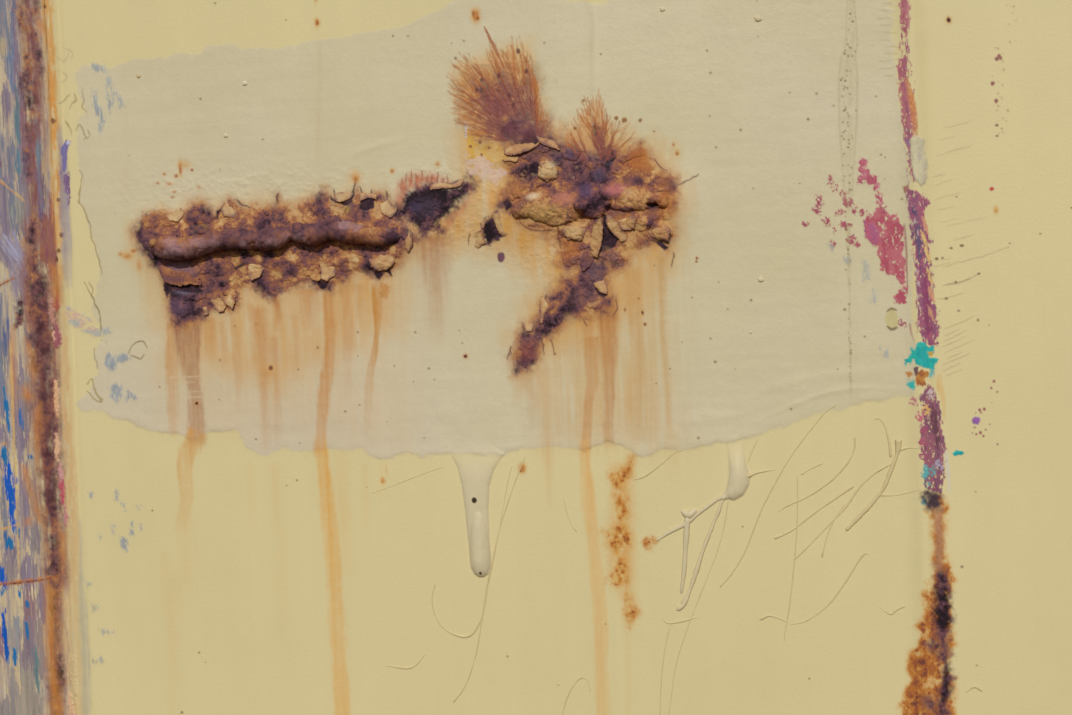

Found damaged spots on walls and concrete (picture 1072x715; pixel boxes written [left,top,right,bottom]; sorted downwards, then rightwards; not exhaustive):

rust [0,0,81,715]
rust [116,0,705,715]
peeling [500,245,623,385]
rust [893,481,961,715]